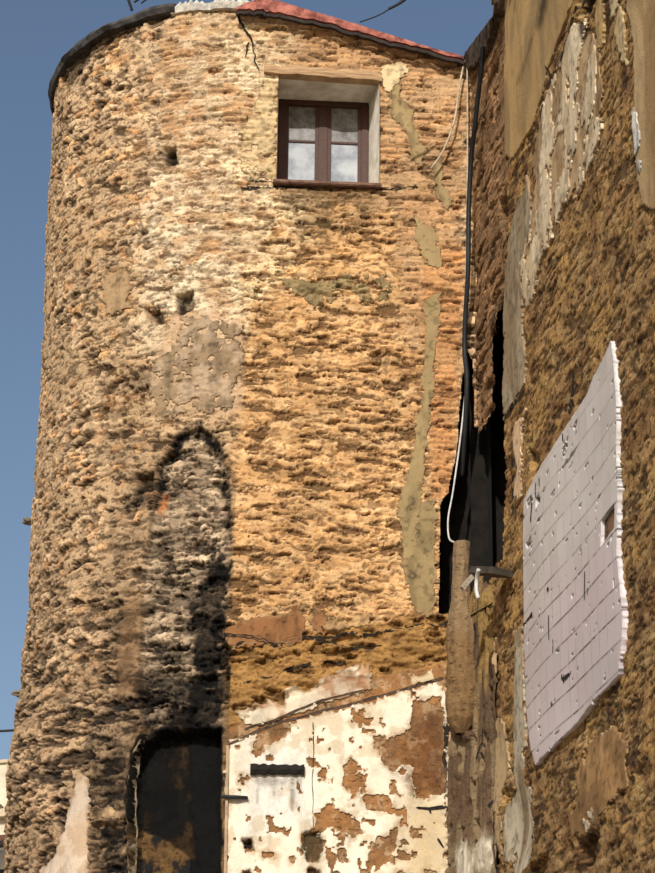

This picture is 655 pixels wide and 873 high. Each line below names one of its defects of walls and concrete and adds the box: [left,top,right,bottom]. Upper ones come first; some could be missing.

crack [237,15,259,70]
peeling [469,0,629,592]
damp [221,465,233,526]
peeling [39,774,120,873]
damp [139,683,208,733]
damp [142,729,226,873]
peeling [223,661,449,873]
peeling [493,626,535,873]